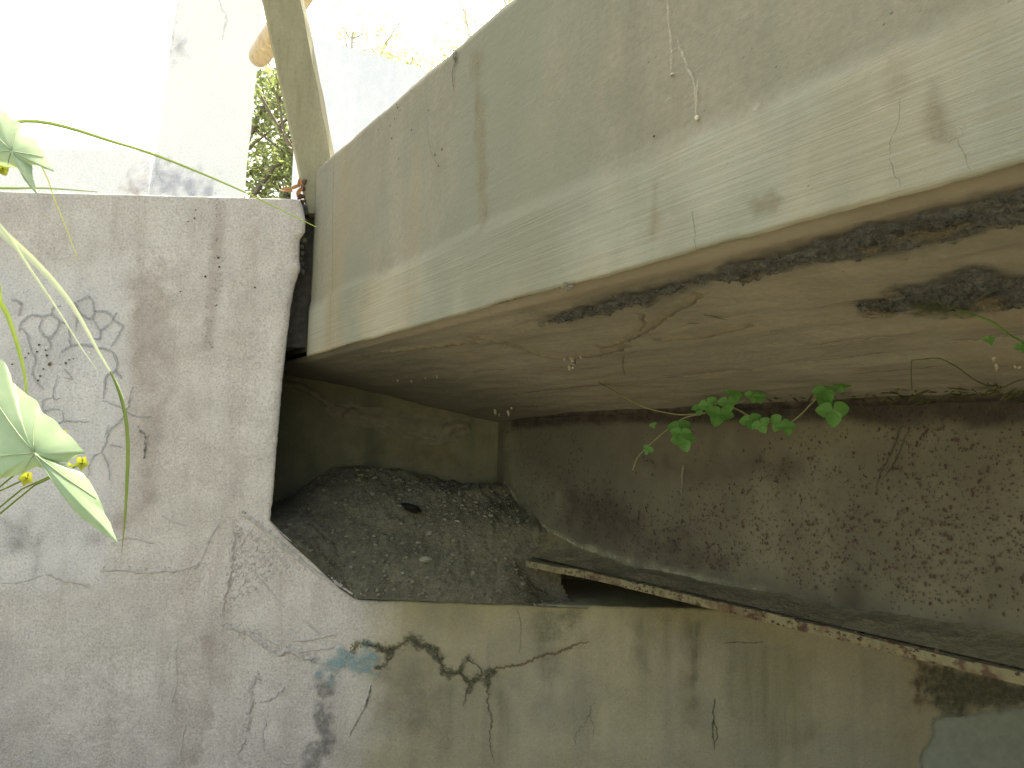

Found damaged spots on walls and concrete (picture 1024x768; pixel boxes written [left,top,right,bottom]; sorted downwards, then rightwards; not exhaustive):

spalling [554,189,1024,324]
crack [12,296,151,480]
corrosion [505,405,1024,616]
crack [345,634,591,760]
crack [711,700,719,749]